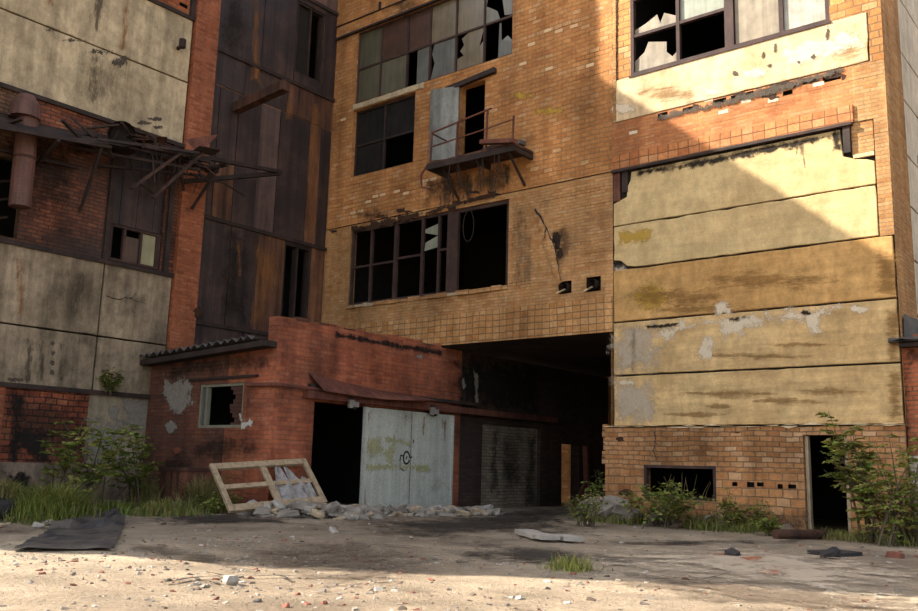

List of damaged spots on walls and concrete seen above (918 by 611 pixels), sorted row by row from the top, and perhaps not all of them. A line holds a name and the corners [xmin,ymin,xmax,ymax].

peeling [657,26,865,121]
crack [534,208,563,284]
peeling [160,373,194,434]
peeling [602,300,869,464]
leakage [17,428,51,463]